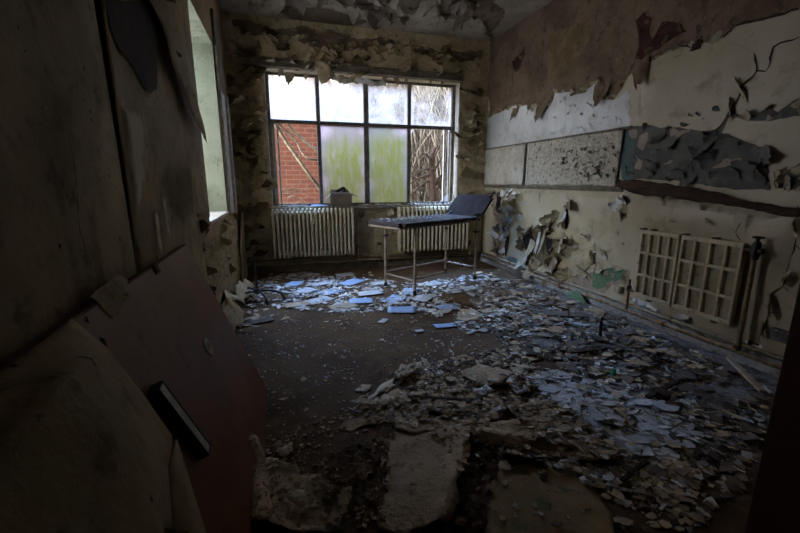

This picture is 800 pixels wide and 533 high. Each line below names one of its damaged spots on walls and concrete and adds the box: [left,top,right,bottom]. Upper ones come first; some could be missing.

flaking render [196,0,800,309]
crack [715,37,799,130]